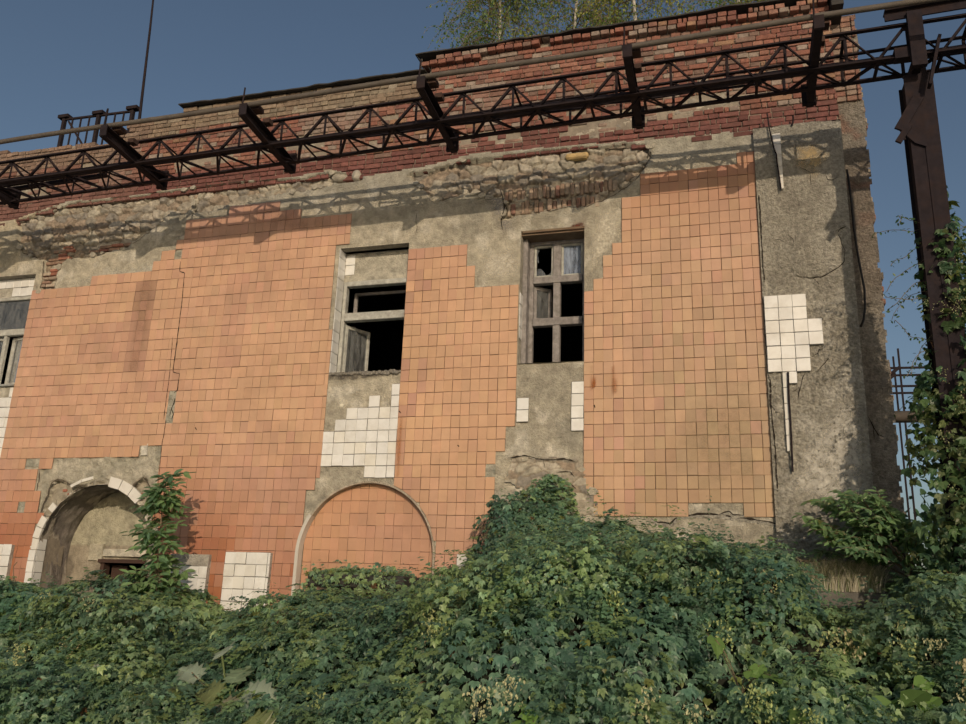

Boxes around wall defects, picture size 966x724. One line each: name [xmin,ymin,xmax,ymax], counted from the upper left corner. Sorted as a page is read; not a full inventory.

spalling [671,92,740,115]
spalling [409,109,655,220]
spalling [16,170,362,294]
crack [158,261,185,481]
spalling [26,444,161,517]